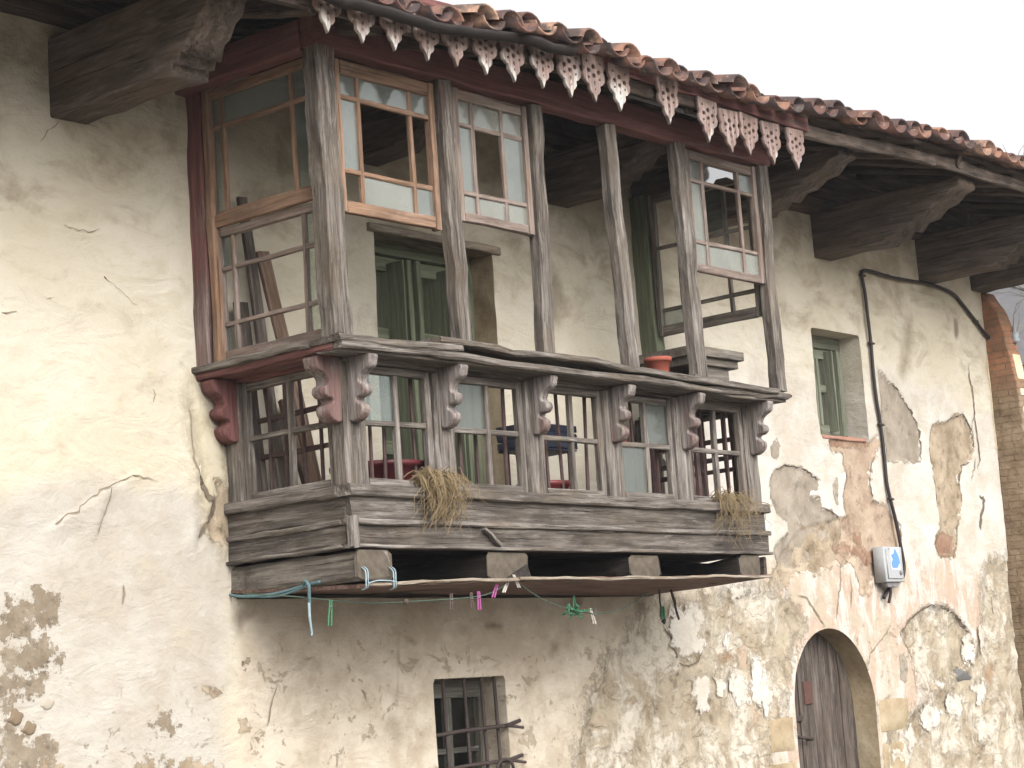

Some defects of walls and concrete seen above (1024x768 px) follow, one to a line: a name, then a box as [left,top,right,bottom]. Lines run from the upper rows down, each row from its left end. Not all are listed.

crack [189,405,200,473]
crack [55,475,156,532]
spalling [768,371,976,597]
flaking render [664,601,707,661]
peeling [0,584,66,768]
flaking render [691,651,774,717]
spalling [899,601,992,755]
peeling [148,710,183,738]